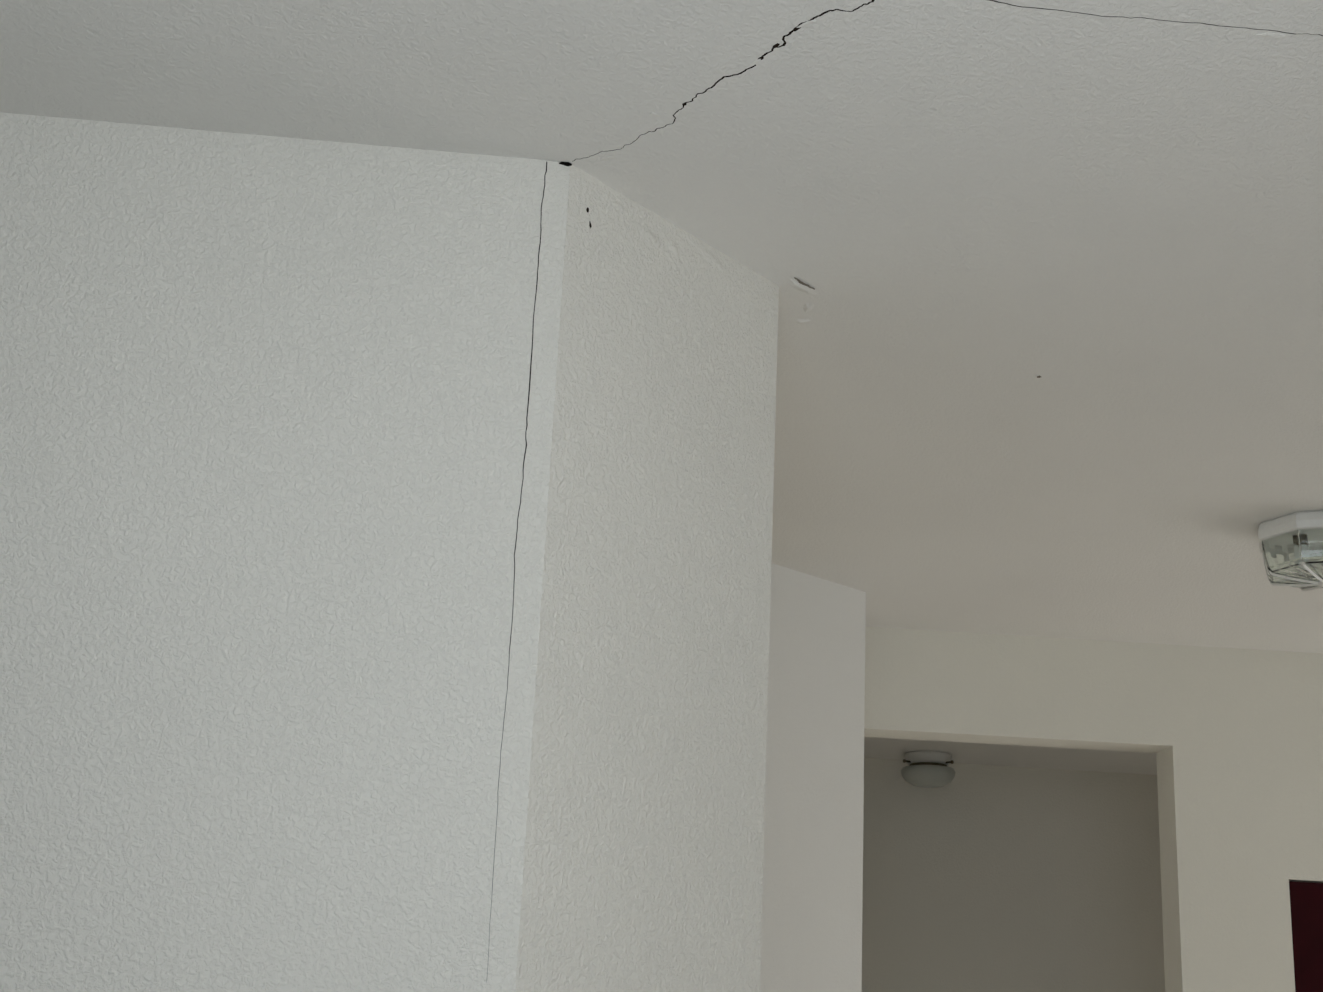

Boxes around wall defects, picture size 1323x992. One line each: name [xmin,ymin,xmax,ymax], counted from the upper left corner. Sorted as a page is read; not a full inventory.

crack [486,0,875,983]
crack [989,0,1323,39]